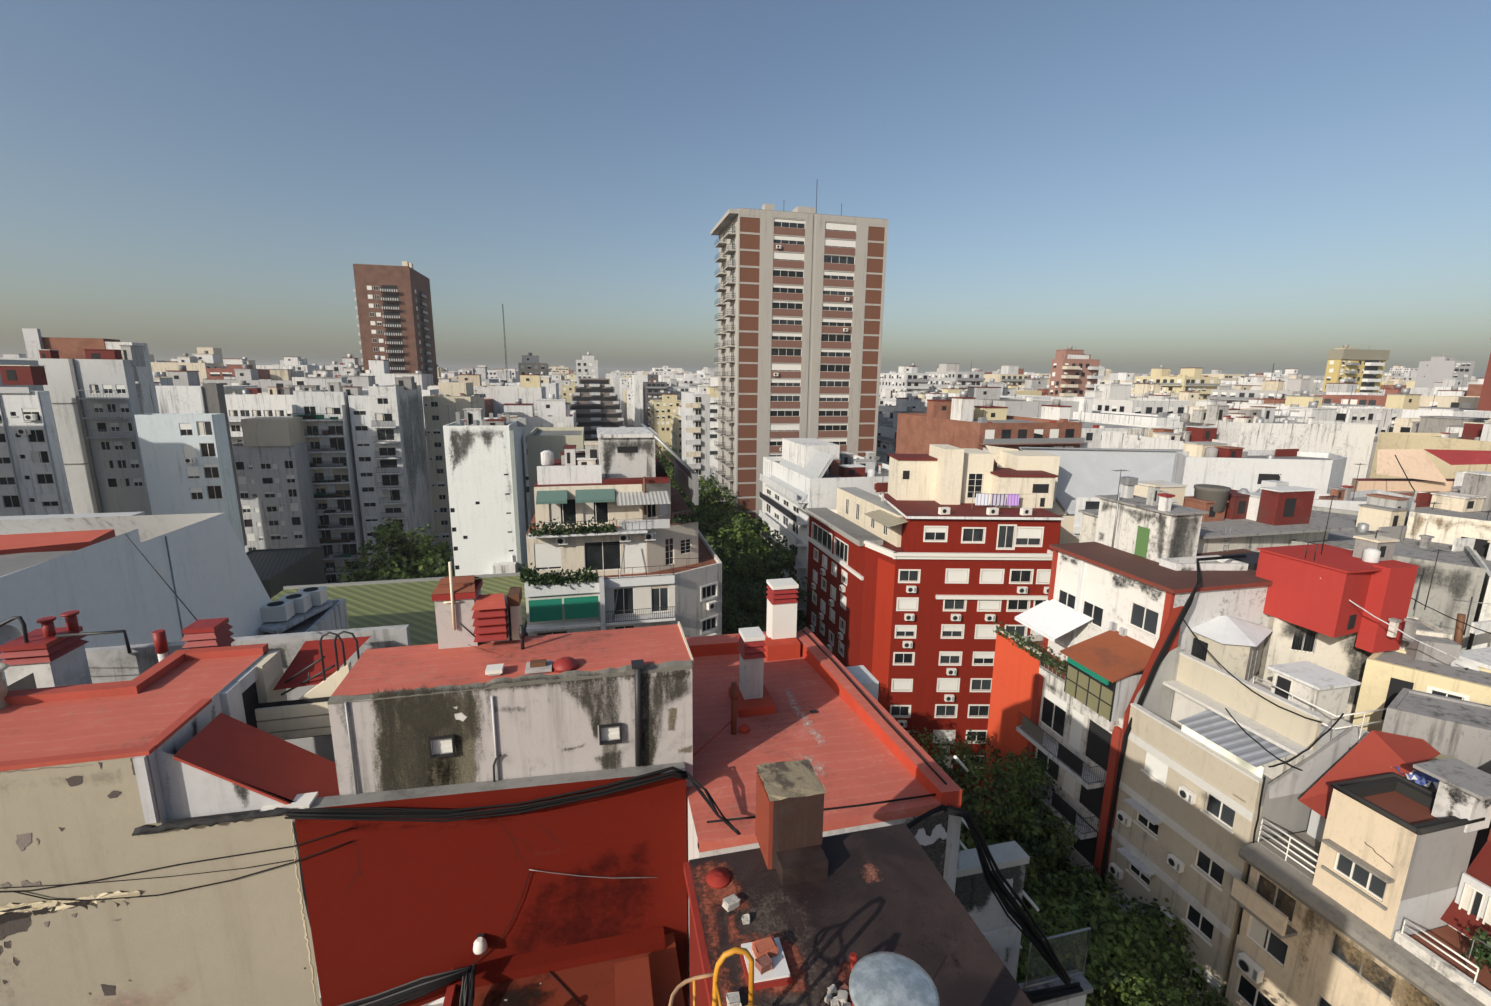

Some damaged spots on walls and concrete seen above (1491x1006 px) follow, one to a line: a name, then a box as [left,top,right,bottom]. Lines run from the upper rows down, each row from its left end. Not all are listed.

damp [451,430,502,465]
damp [374,670,691,791]
peeling [914,824,947,862]
corrosion [865,864,879,882]
peeling [0,880,140,966]
corrosion [693,863,807,1006]
damp [484,980,548,1006]
corrosion [839,961,851,1002]